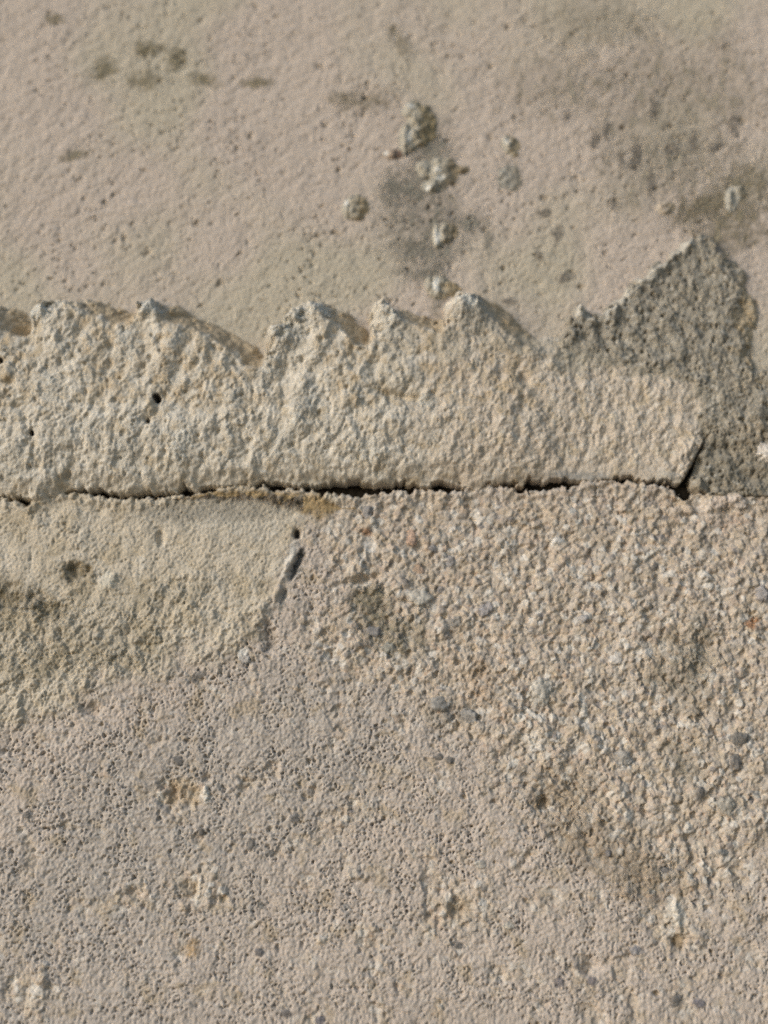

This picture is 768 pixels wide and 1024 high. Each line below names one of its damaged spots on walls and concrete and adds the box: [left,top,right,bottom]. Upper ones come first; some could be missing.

water stain [385,174,479,280]
peeling [756,442,768,461]
crack [94,489,216,500]
crack [258,485,464,499]
crack [503,482,579,494]
crack [616,461,694,501]